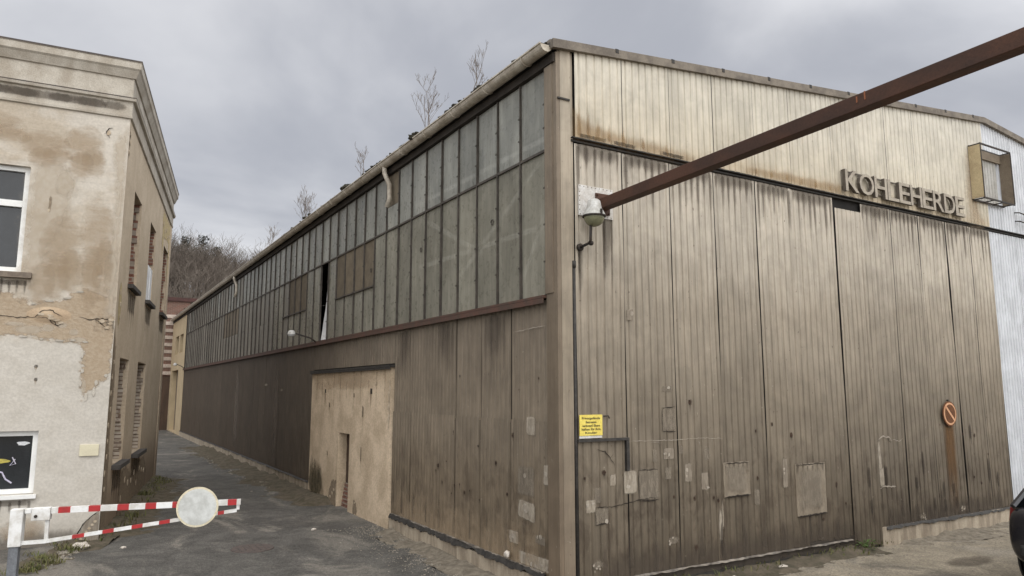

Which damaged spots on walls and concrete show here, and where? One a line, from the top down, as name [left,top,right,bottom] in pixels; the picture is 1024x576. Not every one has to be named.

crack [0,309,108,327]
flaking render [0,284,146,541]